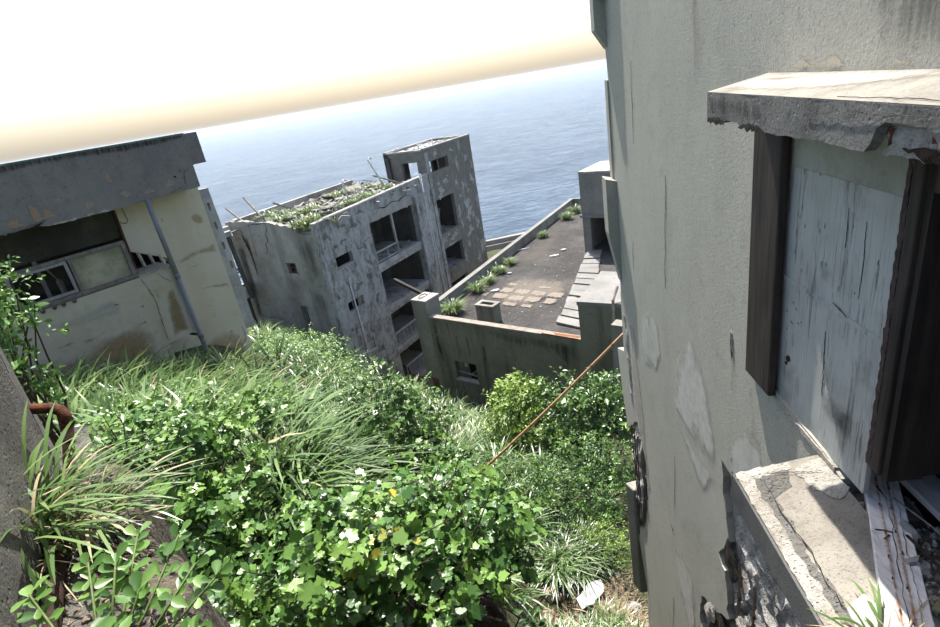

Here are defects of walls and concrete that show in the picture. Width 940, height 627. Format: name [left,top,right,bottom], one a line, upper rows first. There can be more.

crack [805,96,940,117]
spalling [882,126,940,166]
spalling [0,205,56,236]
peeling [433,148,486,262]
leakage [170,293,187,330]
spalling [704,457,852,627]
corrosion [875,476,917,627]